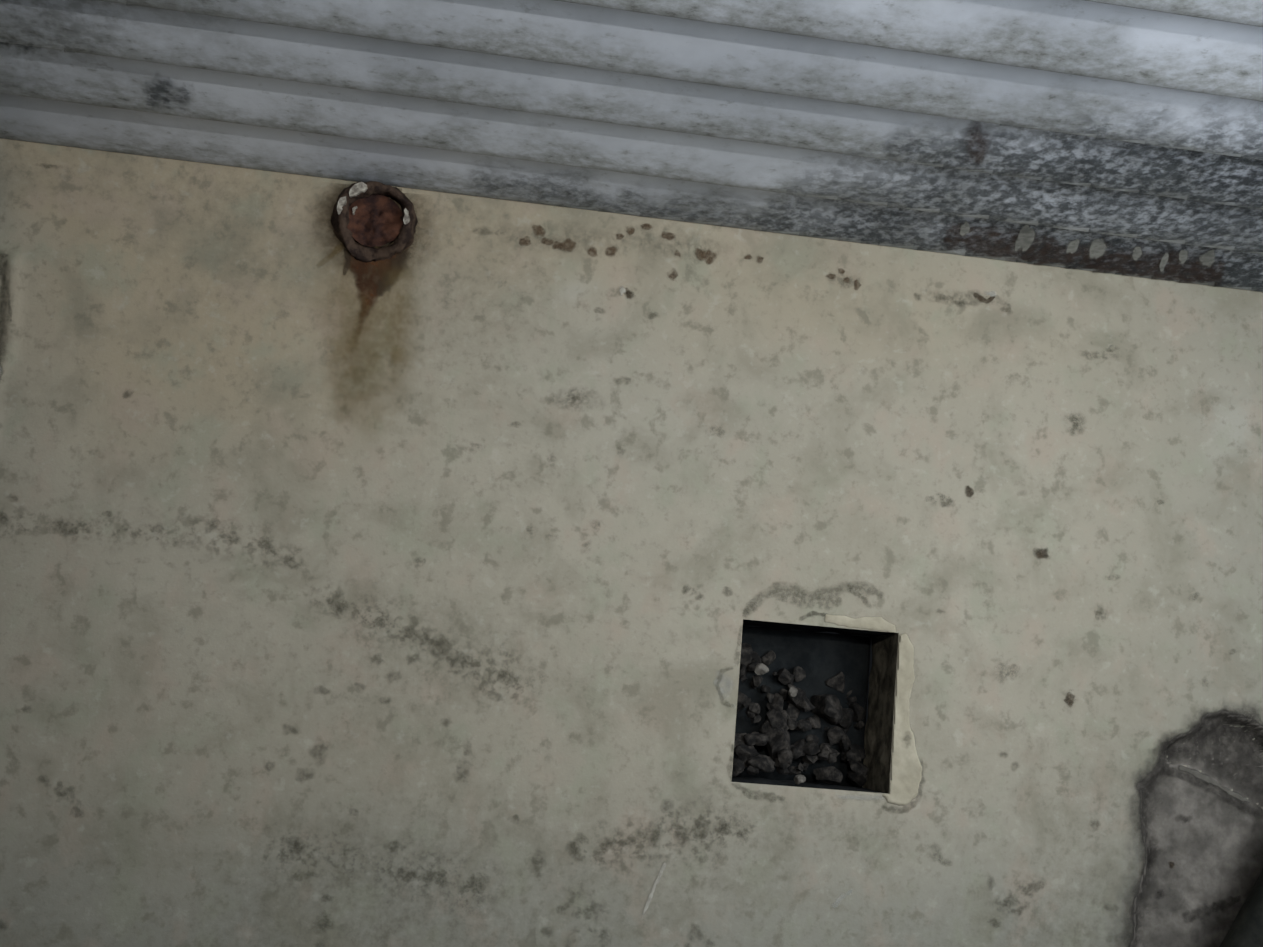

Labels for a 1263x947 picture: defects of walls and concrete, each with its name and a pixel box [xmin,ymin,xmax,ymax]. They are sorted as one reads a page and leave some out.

rust [321,194,419,322]
rust [520,224,674,255]
rust [696,249,716,264]
spalling [1129,710,1263,947]